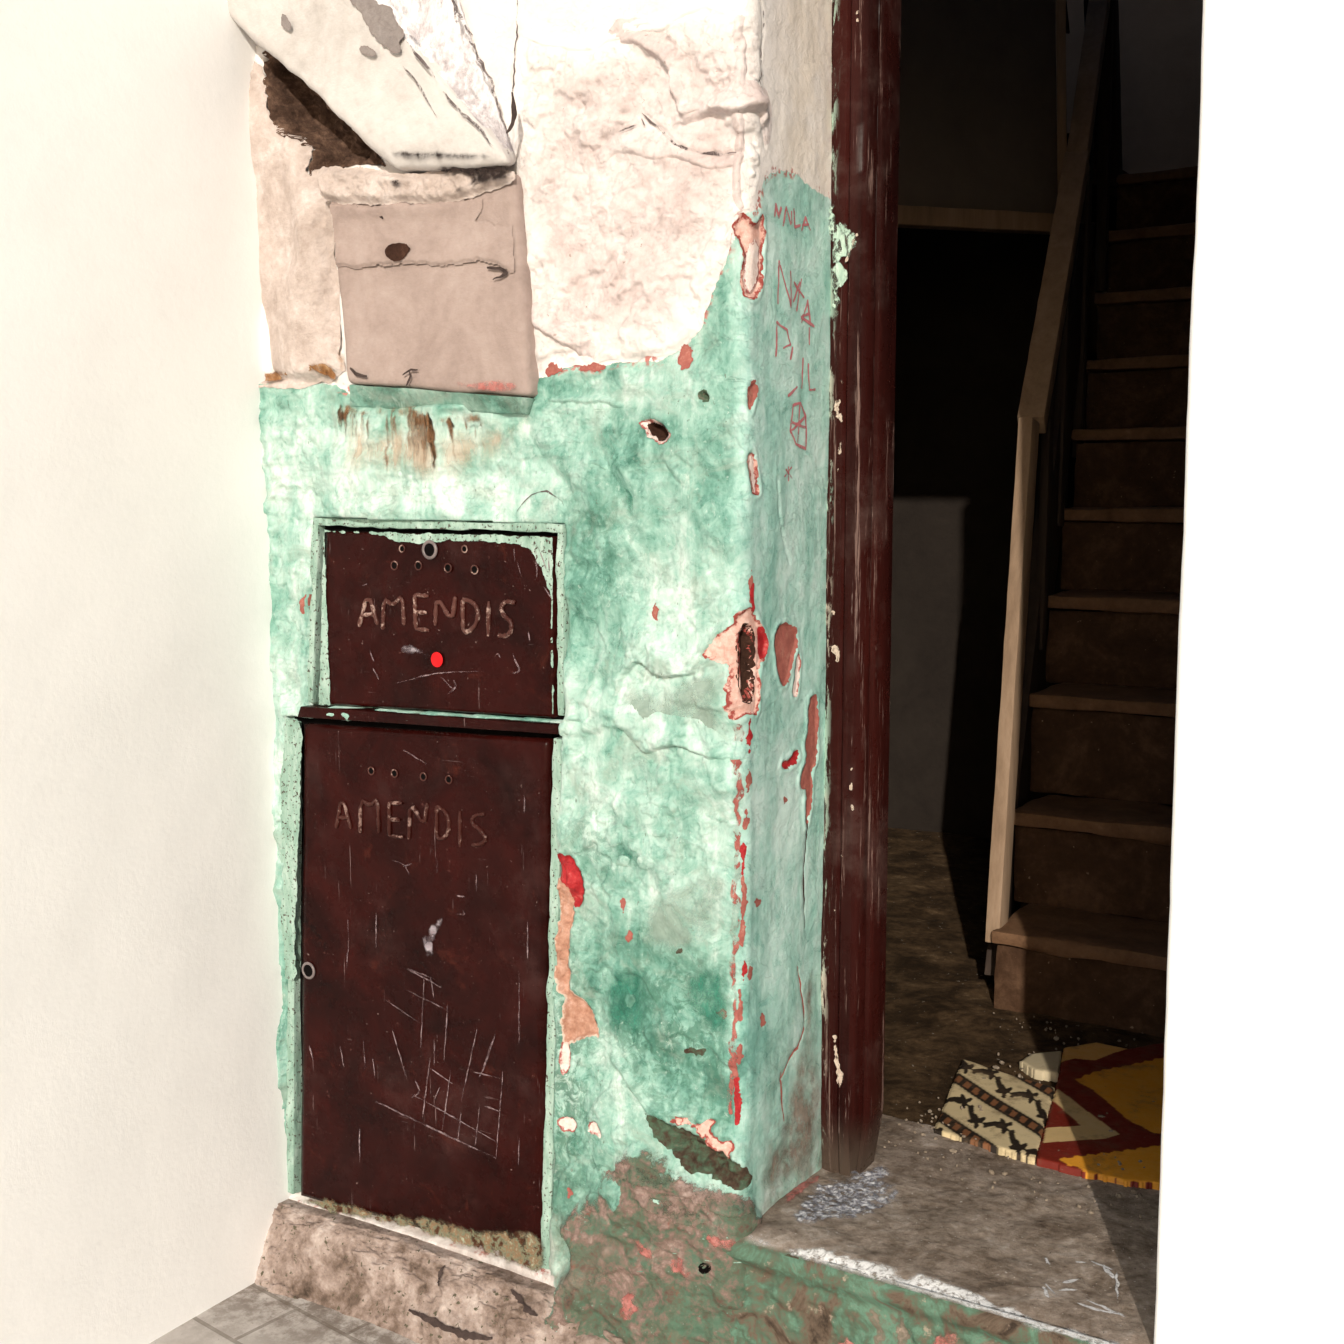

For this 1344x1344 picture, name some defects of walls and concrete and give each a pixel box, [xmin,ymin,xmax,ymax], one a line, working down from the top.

spalling [281,14,291,30]
spalling [350,0,418,57]
peeling [504,0,772,377]
rust [381,410,479,469]
spalling [639,419,671,444]
spalling [544,570,819,1344]